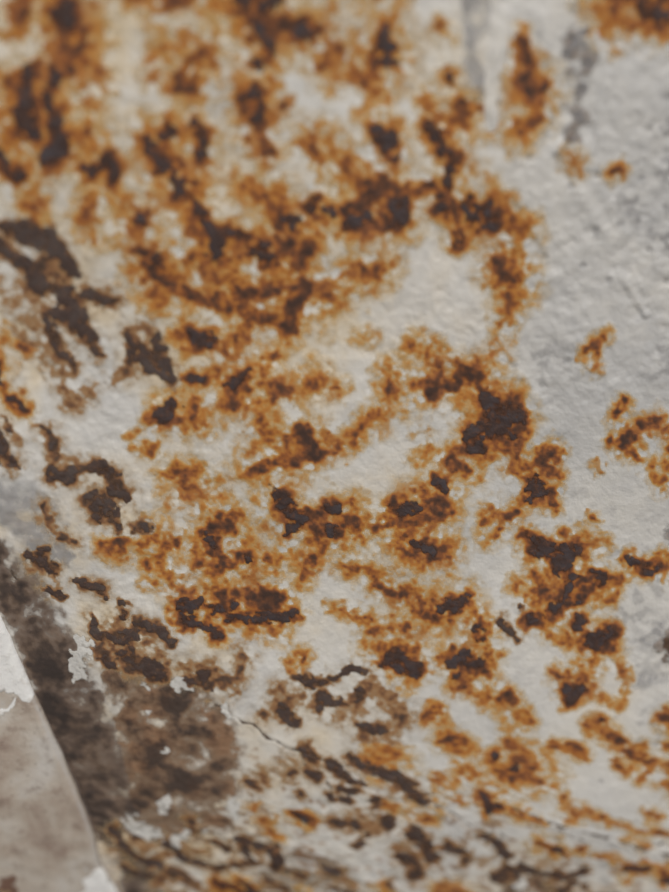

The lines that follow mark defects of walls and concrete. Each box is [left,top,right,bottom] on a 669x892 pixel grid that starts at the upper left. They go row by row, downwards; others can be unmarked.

rust [578,0,669,56]
rust [501,21,559,155]
rust [0,0,544,698]
leakage [0,489,75,564]
peeling [0,616,34,716]
rust [254,378,669,882]
crack [239,719,350,788]
spalling [0,875,18,892]
peeling [82,867,118,892]
rust [104,801,360,892]
rust [475,828,669,892]
crack [512,808,669,858]